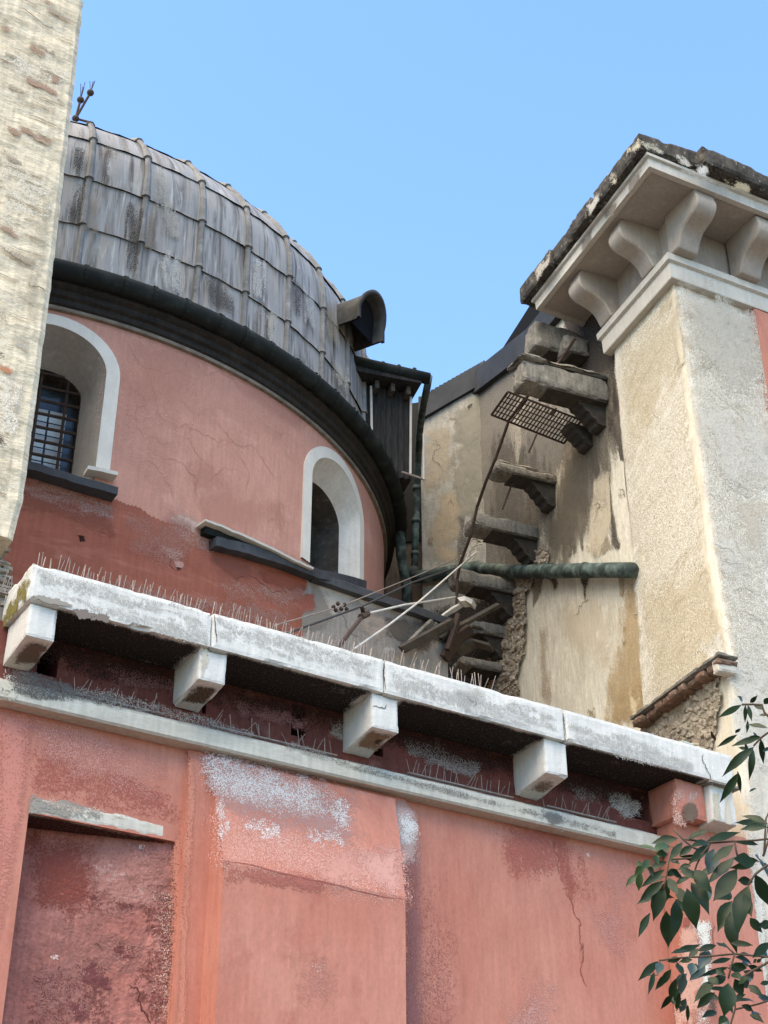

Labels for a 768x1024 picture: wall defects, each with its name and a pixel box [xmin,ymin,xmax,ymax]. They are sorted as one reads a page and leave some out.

damp [68,147,103,234]
damp [124,166,185,292]
damp [448,314,624,565]
damp [4,477,377,679]
flaking render [486,579,534,698]
flaking render [531,547,550,565]
damp [392,578,694,772]
flaking render [640,677,723,751]
efflorescence [194,748,365,847]
damp [285,741,616,905]
damp [396,797,459,1024]
crack [571,899,585,984]